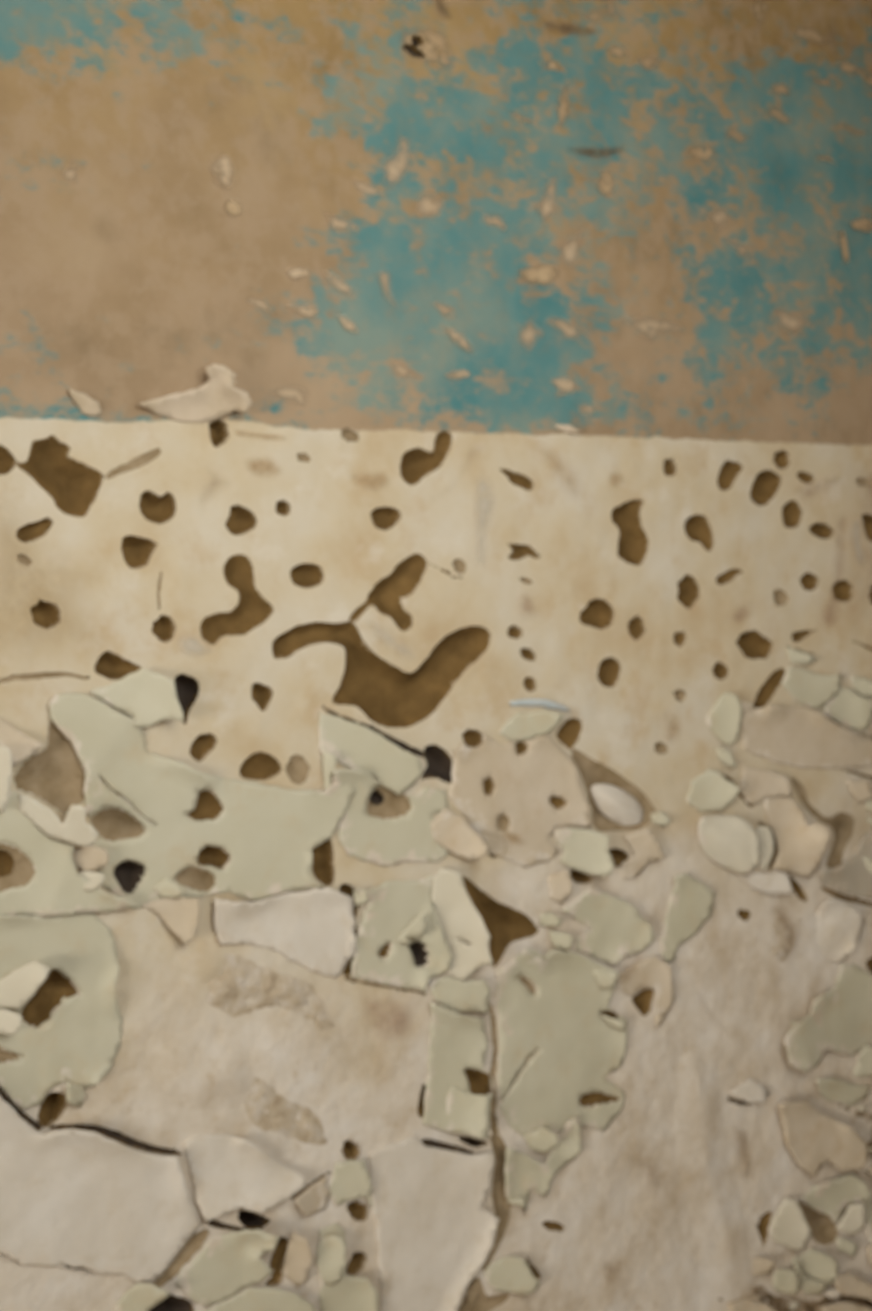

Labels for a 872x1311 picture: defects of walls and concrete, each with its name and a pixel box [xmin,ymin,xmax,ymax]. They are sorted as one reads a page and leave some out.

flaking render [400,430,452,485]
flaking render [0,435,161,569]
flaking render [611,499,649,566]
crack [0,672,133,719]
crack [322,706,425,757]
peeling [686,629,872,903]
peeling [0,553,716,1215]
crack [822,886,872,906]
crack [0,1091,182,1155]
crack [422,1002,539,1311]
crack [153,1220,246,1288]
peeling [113,1140,379,1311]